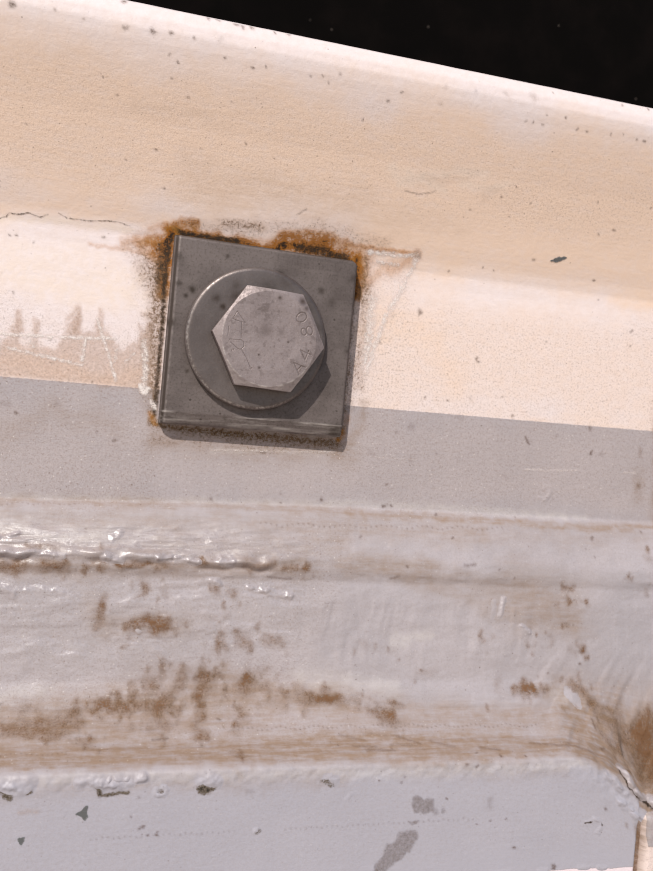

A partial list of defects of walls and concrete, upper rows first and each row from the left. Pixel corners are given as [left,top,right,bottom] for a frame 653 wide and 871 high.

rust [132,219,402,453]
rust [124,614,170,635]
rust [1,691,180,741]
rust [192,671,215,740]
rust [238,673,252,692]
rust [306,686,341,704]
rust [372,700,396,724]
rust [612,707,653,785]
crack [618,769,653,809]